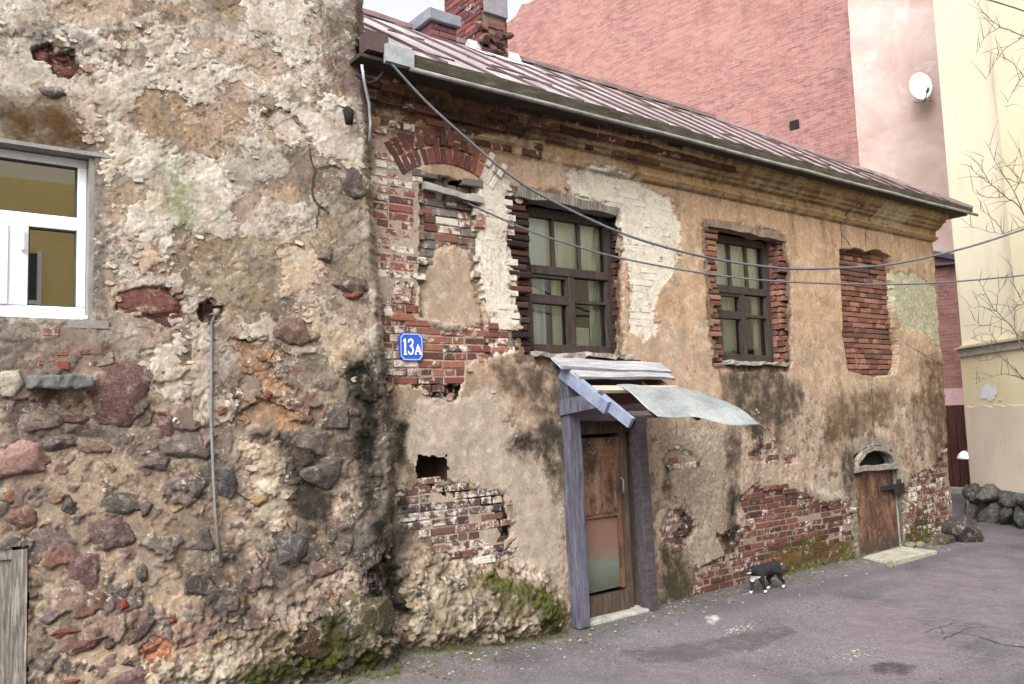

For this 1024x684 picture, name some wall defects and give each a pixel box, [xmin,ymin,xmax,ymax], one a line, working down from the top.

crack [267,106,342,228]
peeling [0,0,567,588]
spalling [565,164,683,342]
damp [279,440,332,531]
damp [343,358,409,509]
spalling [366,554,391,597]
damp [371,499,410,613]
damp [491,355,564,477]
spalling [659,407,859,596]
damp [721,366,804,457]
spalling [901,448,953,546]
peeling [129,635,256,684]